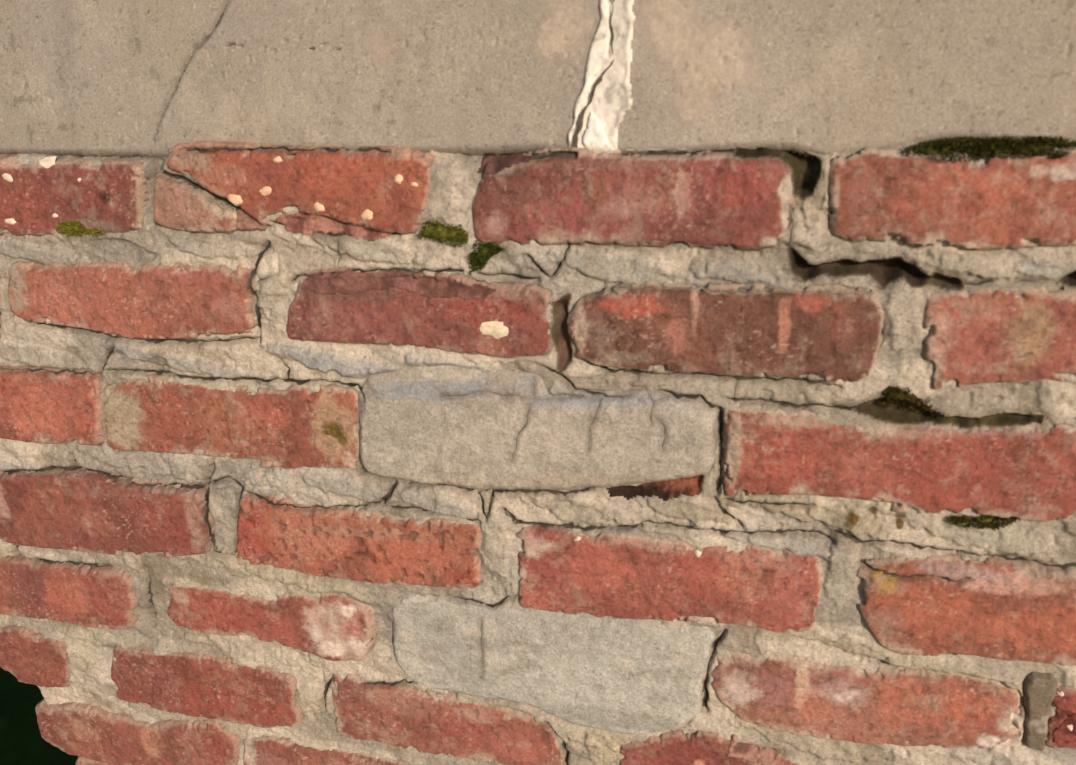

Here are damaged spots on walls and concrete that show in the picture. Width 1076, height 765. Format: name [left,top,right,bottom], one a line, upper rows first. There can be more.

crack [159,1,229,123]
crack [568,0,635,153]
crack [3,367,1076,582]
crack [147,581,156,617]
crack [454,595,517,678]
crack [323,675,333,708]
crack [366,678,415,686]
spalling [1052,713,1076,743]